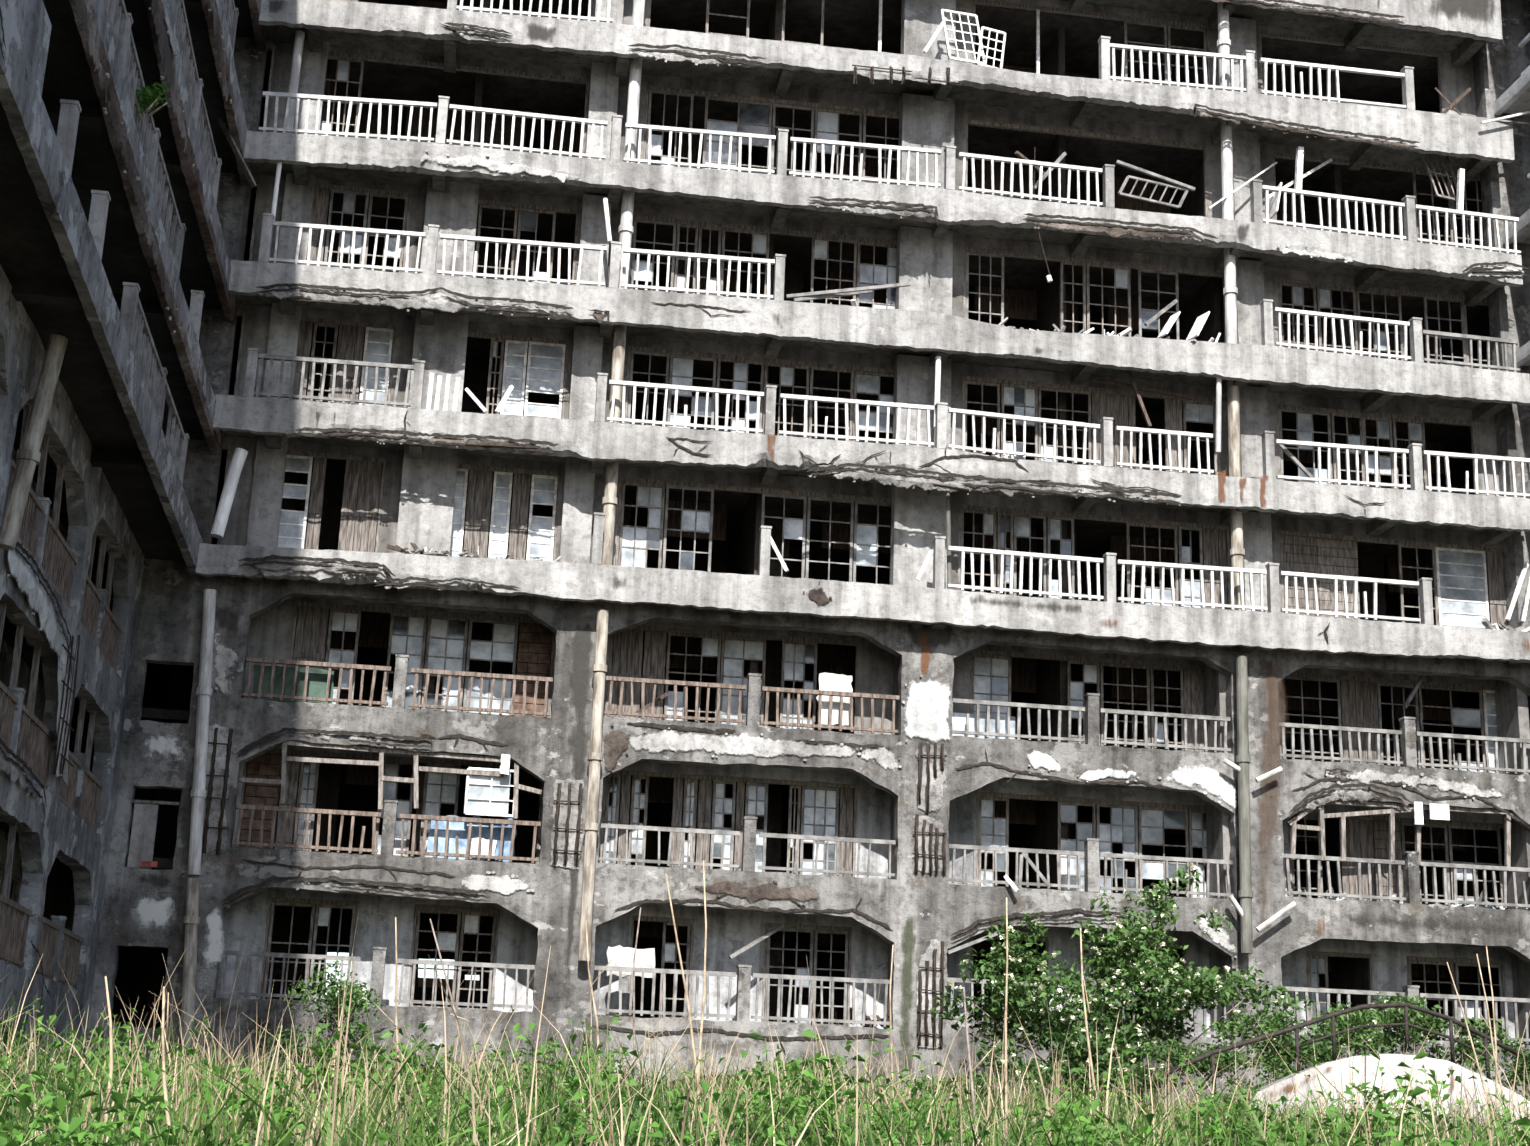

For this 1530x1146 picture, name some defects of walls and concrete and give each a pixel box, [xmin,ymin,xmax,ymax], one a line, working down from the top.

corrosion [1218,470,1268,506]
peeling [601,675,951,874]
peeling [1027,750,1061,774]
peeling [1077,768,1139,784]
peeling [1158,764,1237,808]